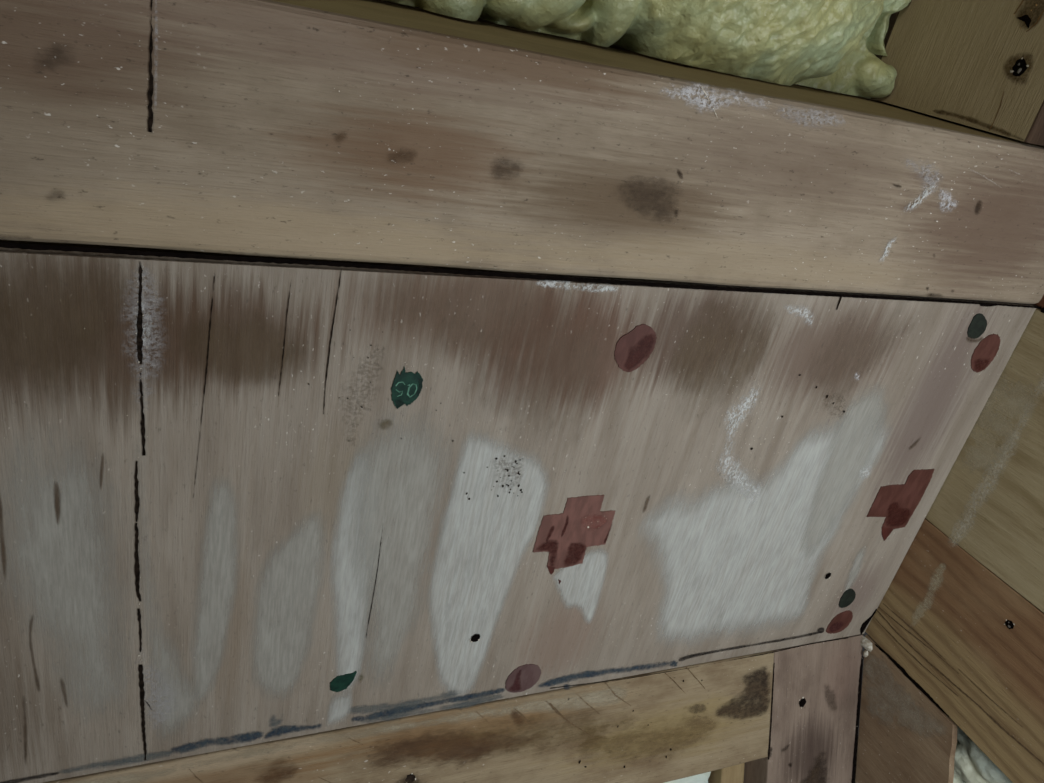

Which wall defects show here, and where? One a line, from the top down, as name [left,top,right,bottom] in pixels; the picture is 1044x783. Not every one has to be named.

crack [128,0,153,132]
crack [127,255,152,760]
water stain [382,736,512,762]
water stain [718,668,769,719]